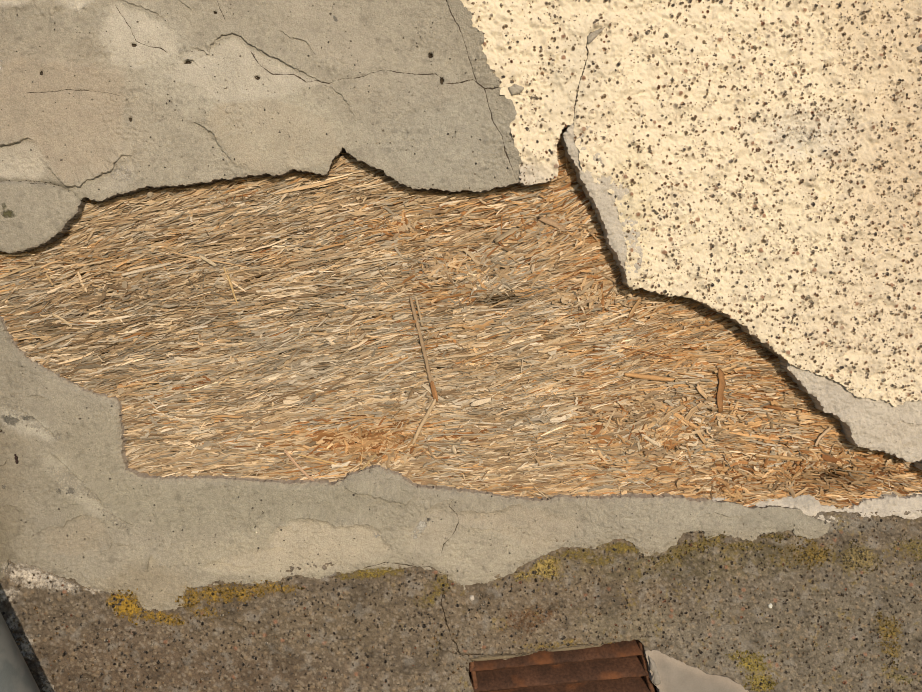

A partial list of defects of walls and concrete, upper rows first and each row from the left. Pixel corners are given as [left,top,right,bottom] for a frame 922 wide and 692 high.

crack [28,88,119,96]
crack [251,0,515,175]
spalling [0,120,922,523]